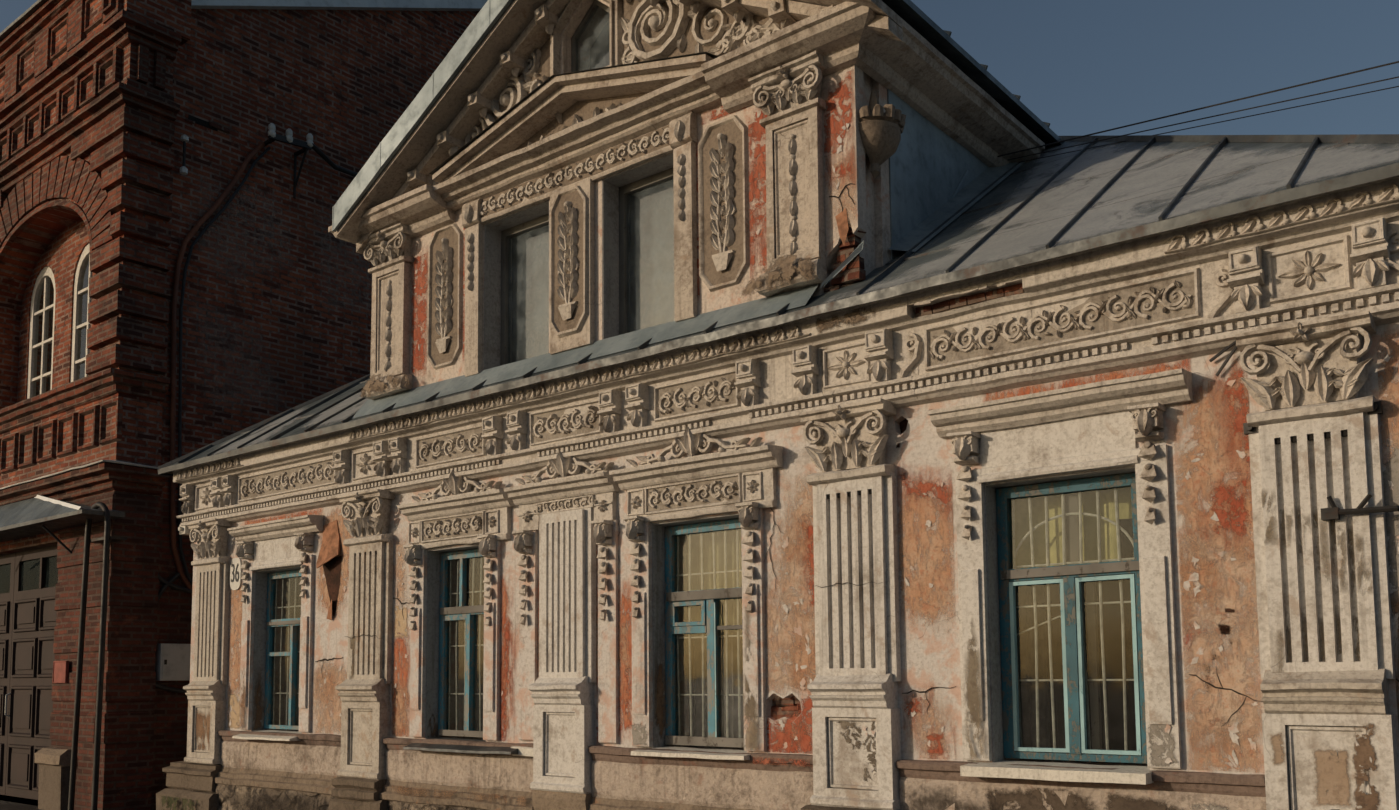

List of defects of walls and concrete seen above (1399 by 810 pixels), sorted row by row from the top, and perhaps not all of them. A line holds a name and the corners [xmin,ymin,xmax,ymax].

spalling [696,72,866,296]
crack [829,183,855,211]
peeling [360,254,428,397]
peeling [986,359,1190,401]
peeling [392,541,410,737]
peeling [753,483,816,766]
peeling [905,696,945,759]
peeling [898,473,954,624]
peeling [1148,367,1285,773]
crack [1189,667,1263,727]
flaking render [1314,723,1380,810]
flaking render [1378,335,1399,614]